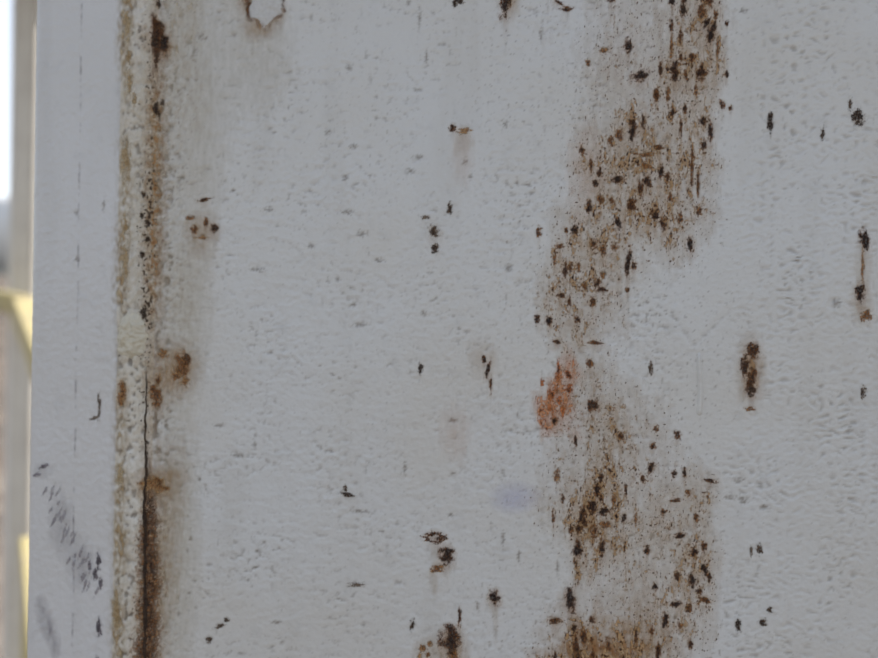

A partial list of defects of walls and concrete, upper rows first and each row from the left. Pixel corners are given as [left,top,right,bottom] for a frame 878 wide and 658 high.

corrosion [499,0,511,20]
corrosion [151,14,170,68]
corrosion [186,216,219,239]
corrosion [855,226,872,322]
corrosion [532,0,732,658]
corrosion [117,382,126,406]
corrosion [149,349,190,408]
corrosion [740,342,759,411]
corrosion [137,475,171,494]
crack [132,380,162,658]
corrosion [418,609,462,658]